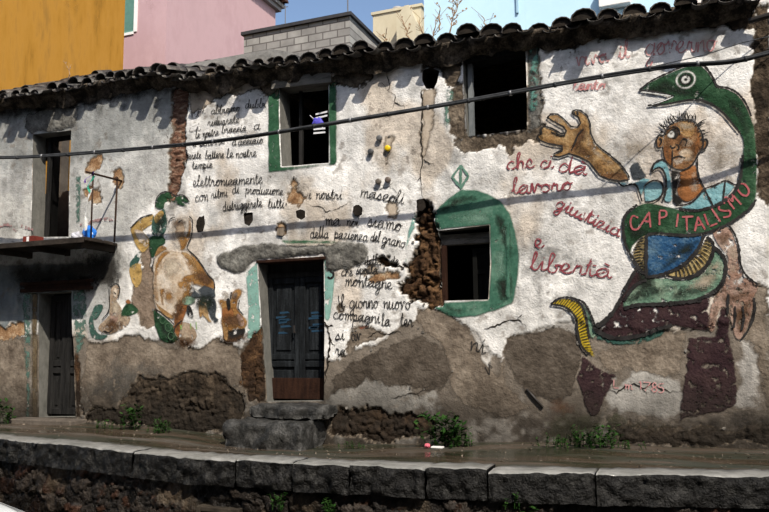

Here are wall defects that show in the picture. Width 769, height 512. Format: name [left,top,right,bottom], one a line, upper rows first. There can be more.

flaking render [168,84,260,202]
crack [380,73,433,199]
peeling [86,155,103,172]
peeling [113,168,124,188]
peeling [85,186,103,205]
spalling [362,203,444,309]
peeling [0,322,25,341]